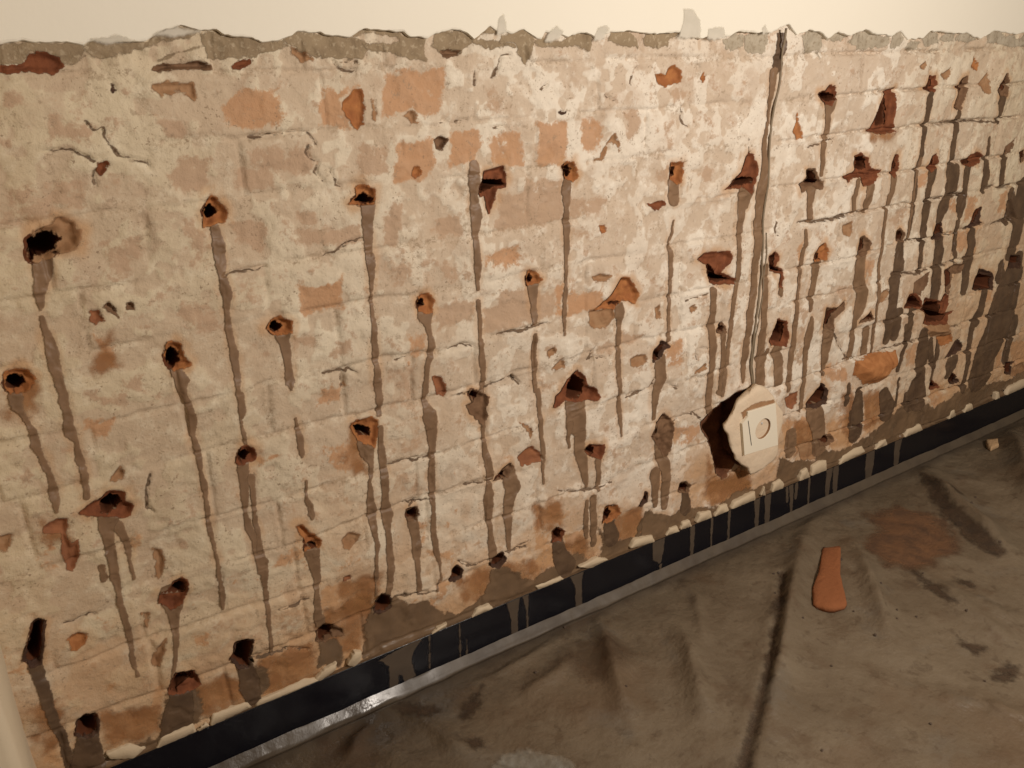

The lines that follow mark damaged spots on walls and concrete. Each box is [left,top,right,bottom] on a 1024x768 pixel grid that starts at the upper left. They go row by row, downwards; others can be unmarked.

flaking render [0,26,592,101]
flaking render [608,31,680,49]
flaking render [802,31,1024,56]
crack [51,120,149,185]
water stain [28,244,90,500]
water stain [210,224,247,444]
spalling [588,273,640,329]
water stain [305,33,1024,688]
spalling [698,250,736,285]
water stain [295,417,305,458]
spalling [700,389,746,480]
spalling [43,466,134,571]